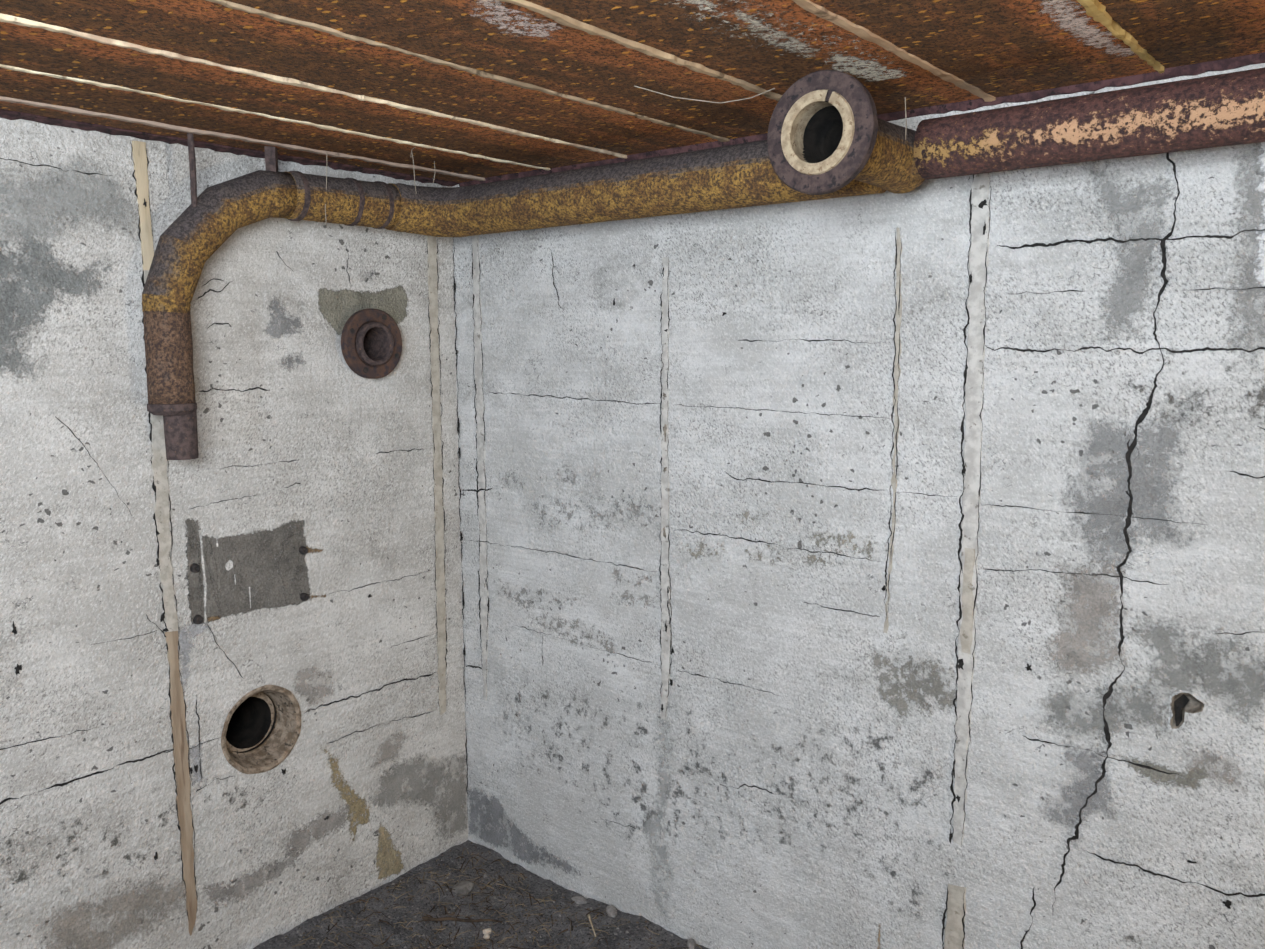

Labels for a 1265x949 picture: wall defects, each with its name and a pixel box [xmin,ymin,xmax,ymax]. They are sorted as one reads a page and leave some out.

water stain [0,236,109,377]
water stain [1092,162,1172,332]
water stain [1234,142,1265,349]
crack [305,153,1265,949]
crack [0,412,301,932]
spalling [1170,692,1204,729]
corrosion [320,748,404,879]